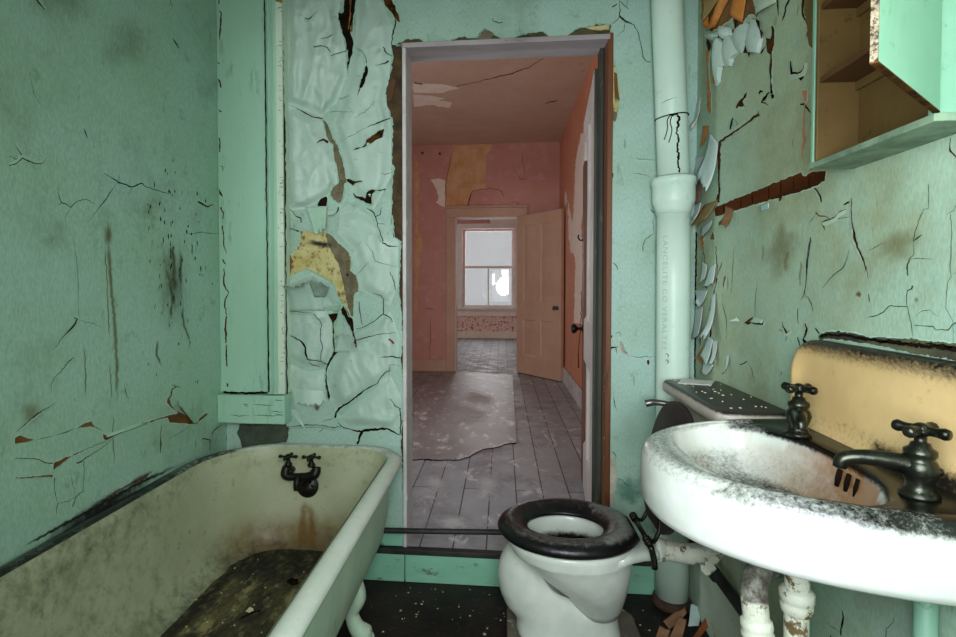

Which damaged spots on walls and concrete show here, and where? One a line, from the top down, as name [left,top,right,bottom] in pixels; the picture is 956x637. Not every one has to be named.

crack [17,173,169,433]
rust [105,253,118,393]
damp [148,202,206,345]
flaking render [290,229,359,318]
flaking render [384,27,549,378]
flaking render [563,22,612,36]
crack [694,232,734,377]
peeling [701,0,763,87]
crack [716,90,769,202]
crack [787,61,811,160]
crack [780,185,956,346]
spalling [818,329,956,361]